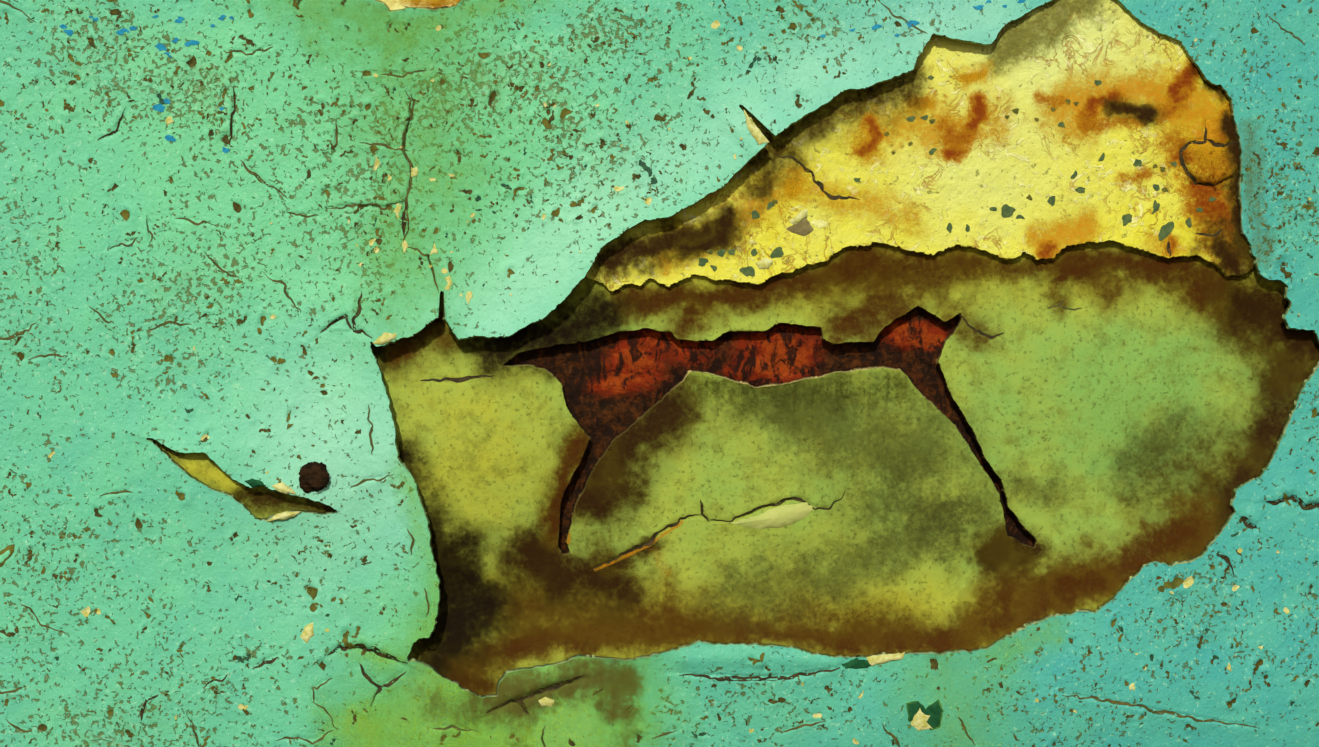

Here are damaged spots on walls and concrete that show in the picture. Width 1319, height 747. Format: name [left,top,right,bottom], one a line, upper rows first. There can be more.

spalling [22,0,143,122]
crack [98,107,126,140]
spalling [144,21,292,147]
crack [229,70,439,292]
crack [109,215,372,338]
spalling [195,296,286,364]
peeling [302,0,1319,747]
corrosion [359,0,1319,747]
peeling [0,508,111,581]
crack [1242,495,1319,529]
peeling [270,551,366,679]
crack [276,643,408,744]